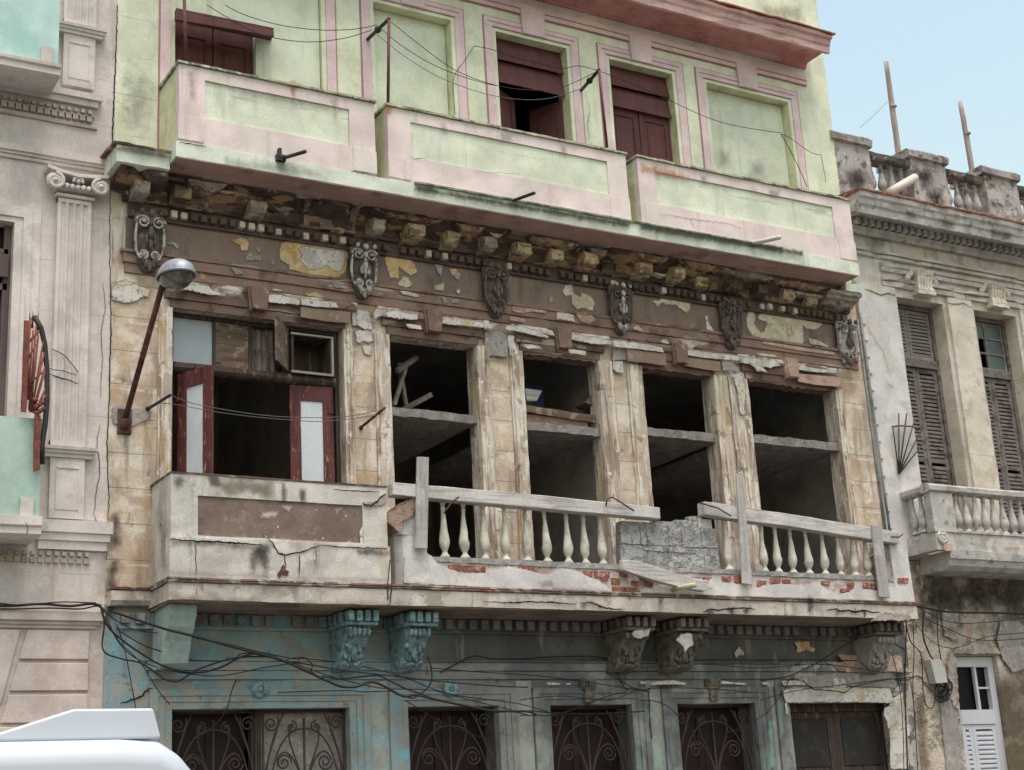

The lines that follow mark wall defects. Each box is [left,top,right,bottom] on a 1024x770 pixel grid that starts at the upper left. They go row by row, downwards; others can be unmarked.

crack [111,5,119,142]
damp [849,172,863,188]
peeling [384,256,419,298]
crack [49,179,112,521]
peeling [268,289,422,355]
peeling [434,264,843,416]
damp [252,545,268,567]
crack [170,534,387,574]
flaking render [448,564,486,573]
flaking render [583,570,653,592]
peeling [676,633,694,652]
peeling [997,618,1024,672]